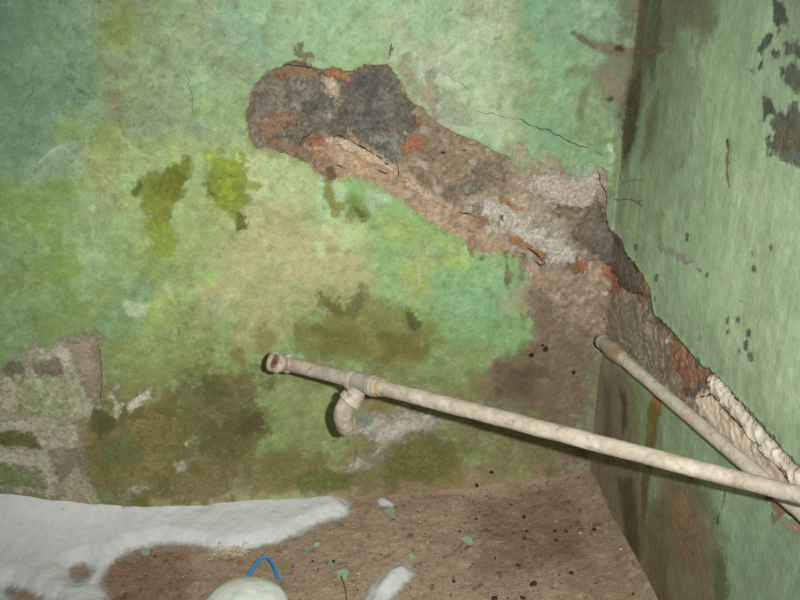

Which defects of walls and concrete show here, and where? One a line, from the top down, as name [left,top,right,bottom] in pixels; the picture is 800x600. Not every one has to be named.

damp [572,0,716,164]
peeling [751,0,800,168]
damp [154,155,188,203]
crack [475,112,643,207]
spalling [238,43,800,485]
damp [295,287,445,377]
peeling [0,329,152,505]
peeling [159,436,251,506]
damp [174,364,275,460]
damp [299,402,455,491]
damp [597,368,637,444]
damp [599,455,727,600]